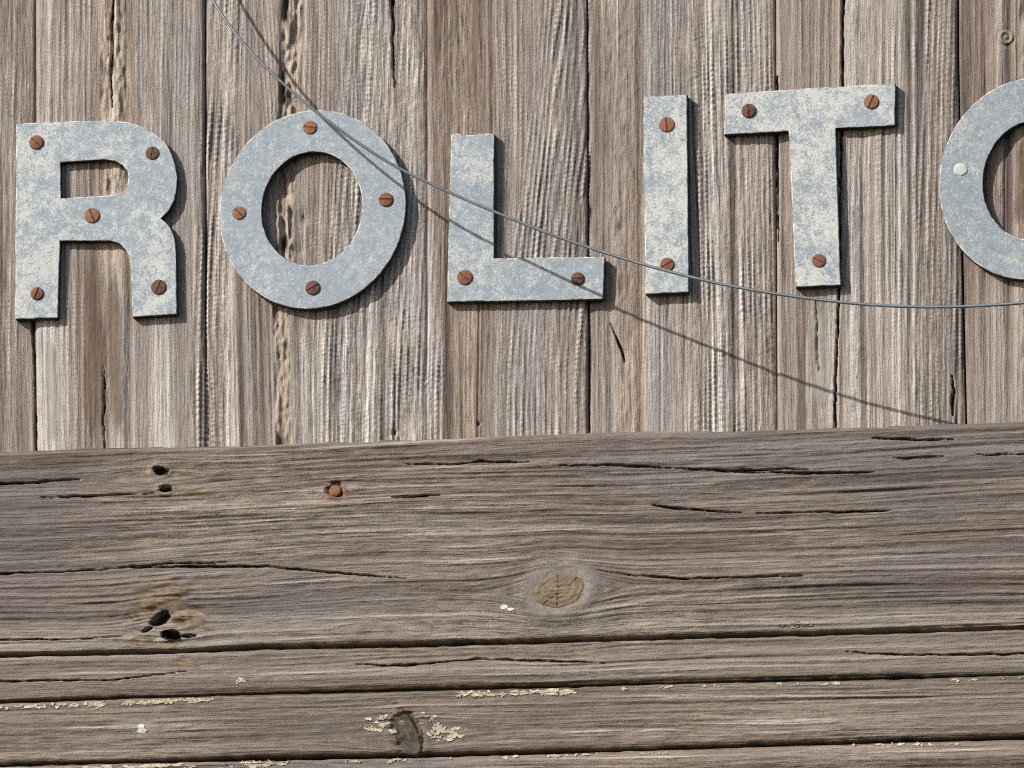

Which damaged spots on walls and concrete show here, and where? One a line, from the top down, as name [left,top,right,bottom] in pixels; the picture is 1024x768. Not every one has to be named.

crack [108,0,116,102]
crack [389,0,397,81]
crack [839,0,847,87]
crack [837,131,845,255]
crack [612,329,625,361]
crack [815,288,840,427]
crack [758,508,891,516]
crack [0,562,406,580]